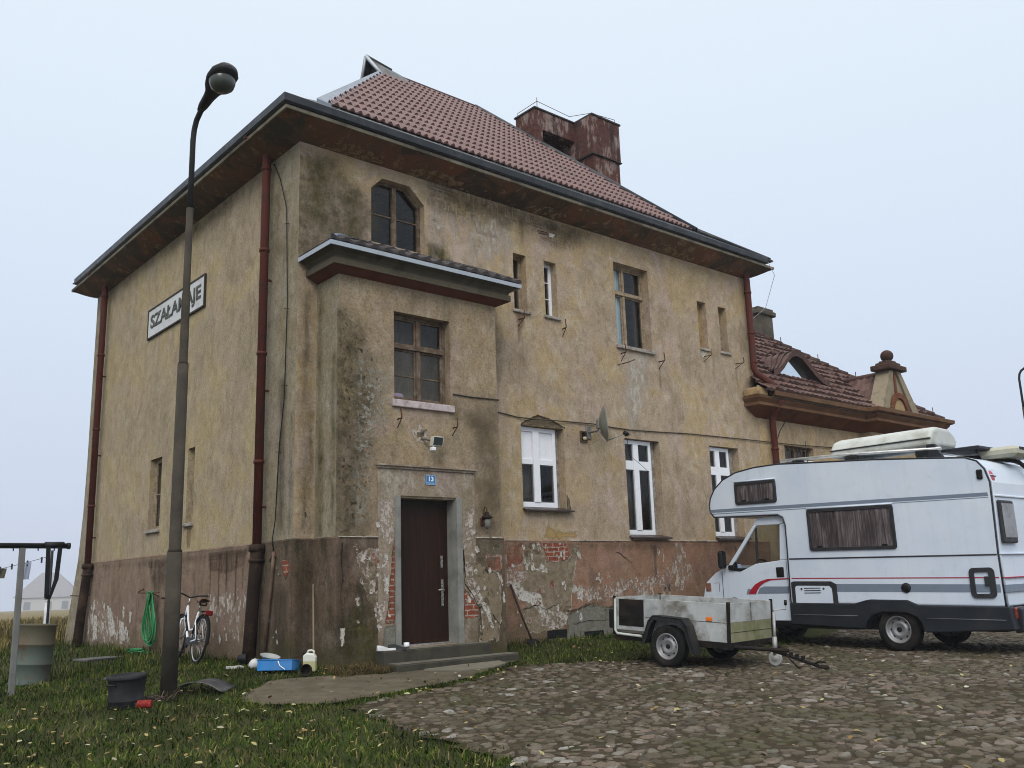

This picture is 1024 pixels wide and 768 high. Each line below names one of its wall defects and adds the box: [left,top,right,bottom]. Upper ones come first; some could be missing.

water stain [332,310,388,536]
peeling [87,600,132,645]
flaking render [351,498,396,648]
flaking render [463,510,692,642]